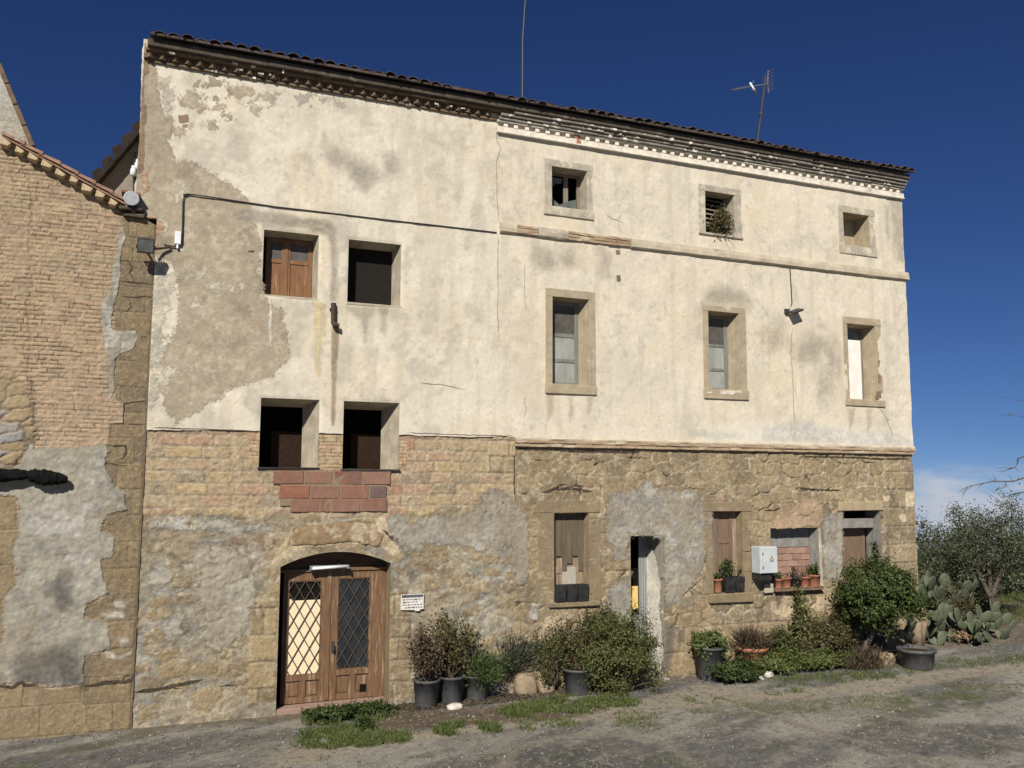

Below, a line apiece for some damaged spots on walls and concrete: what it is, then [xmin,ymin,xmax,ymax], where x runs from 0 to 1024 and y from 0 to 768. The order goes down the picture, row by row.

peeling [136,43,345,424]